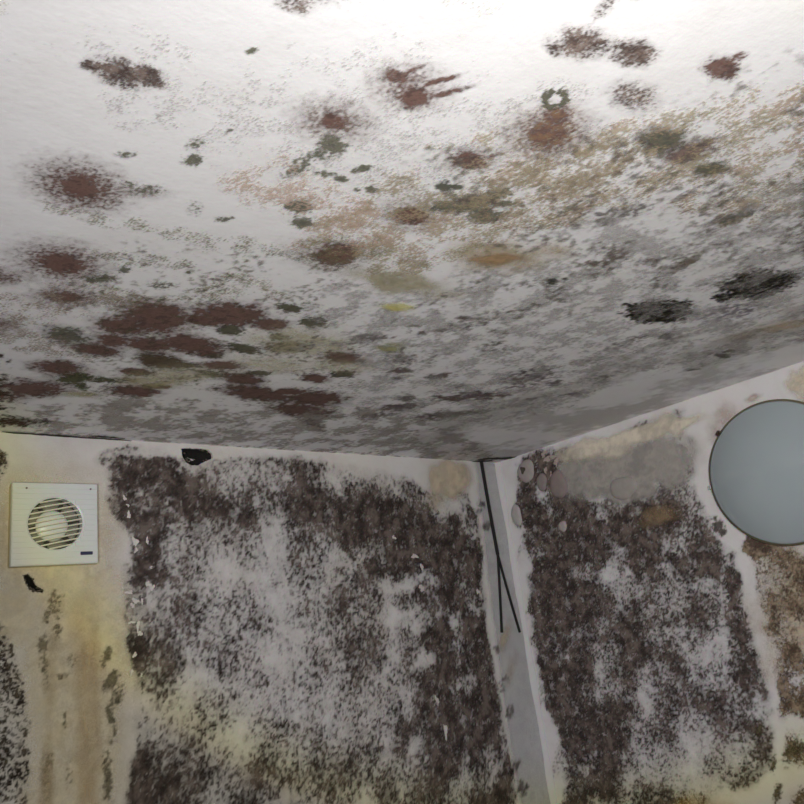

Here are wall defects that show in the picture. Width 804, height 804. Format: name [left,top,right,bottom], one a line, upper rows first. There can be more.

water stain [282,0,310,13]
water stain [81,57,165,89]
water stain [382,65,470,110]
water stain [546,28,657,66]
water stain [703,52,746,80]
water stain [185,139,204,166]
water stain [36,158,160,228]
water stain [223,83,804,371]
spalling [181,448,211,465]
water stain [0,245,579,804]
water stain [515,410,804,804]